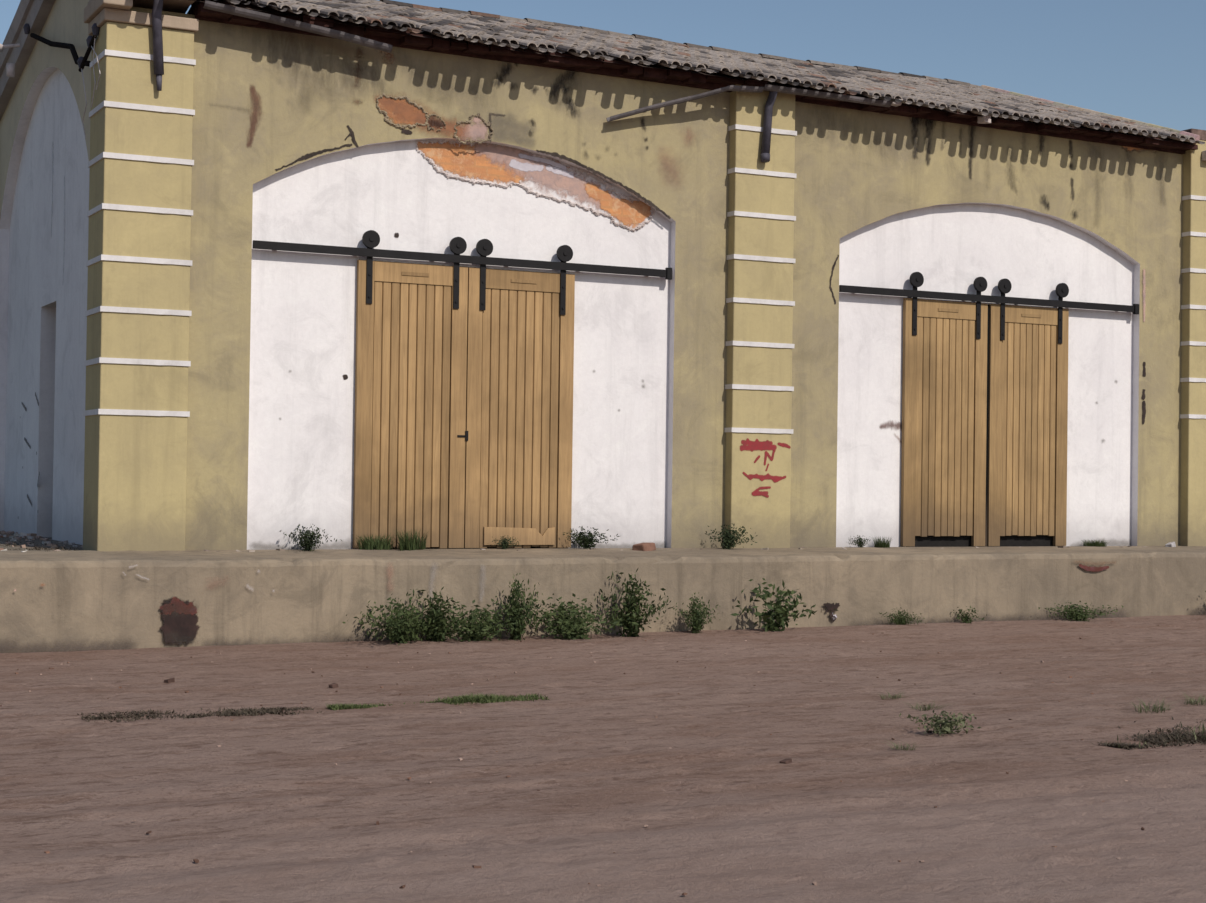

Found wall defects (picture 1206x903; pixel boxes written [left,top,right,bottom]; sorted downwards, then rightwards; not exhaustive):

damp [533,71,576,114]
crack [275,125,359,171]
spalling [377,93,655,231]
damp [912,117,934,164]